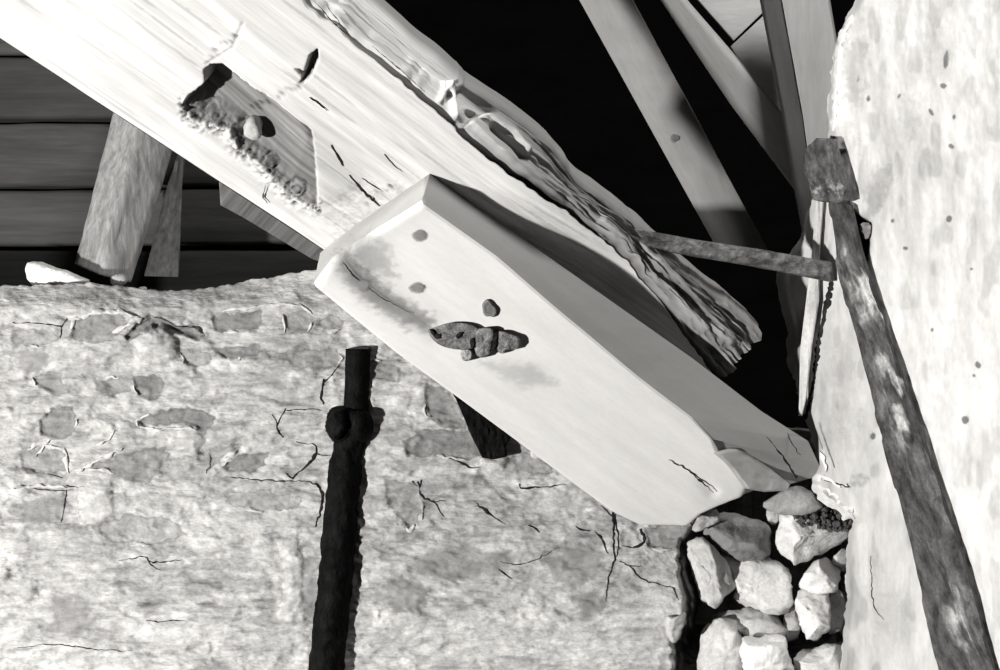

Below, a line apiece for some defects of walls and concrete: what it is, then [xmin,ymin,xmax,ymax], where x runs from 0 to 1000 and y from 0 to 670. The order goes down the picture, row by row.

crack [331,145,380,206]
crack [12,319,67,337]
spalling [12,310,262,367]
crack [766,282,834,479]
crack [206,364,340,527]
crack [21,473,84,523]
crack [412,480,445,520]
crack [474,503,503,523]
crack [670,460,714,493]
crack [118,556,180,570]
crack [498,525,556,579]
crack [576,505,679,601]